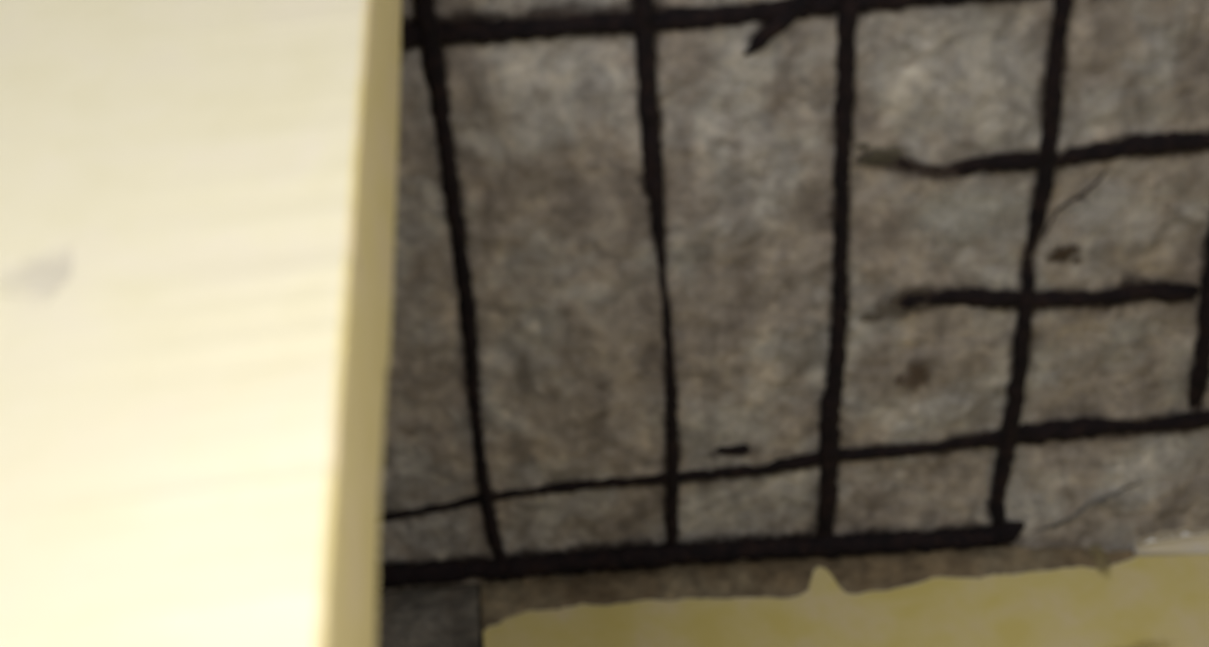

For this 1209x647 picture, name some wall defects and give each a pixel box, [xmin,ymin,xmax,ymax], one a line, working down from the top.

spalling [377,0,1209,647]
crack [1031,480,1144,533]